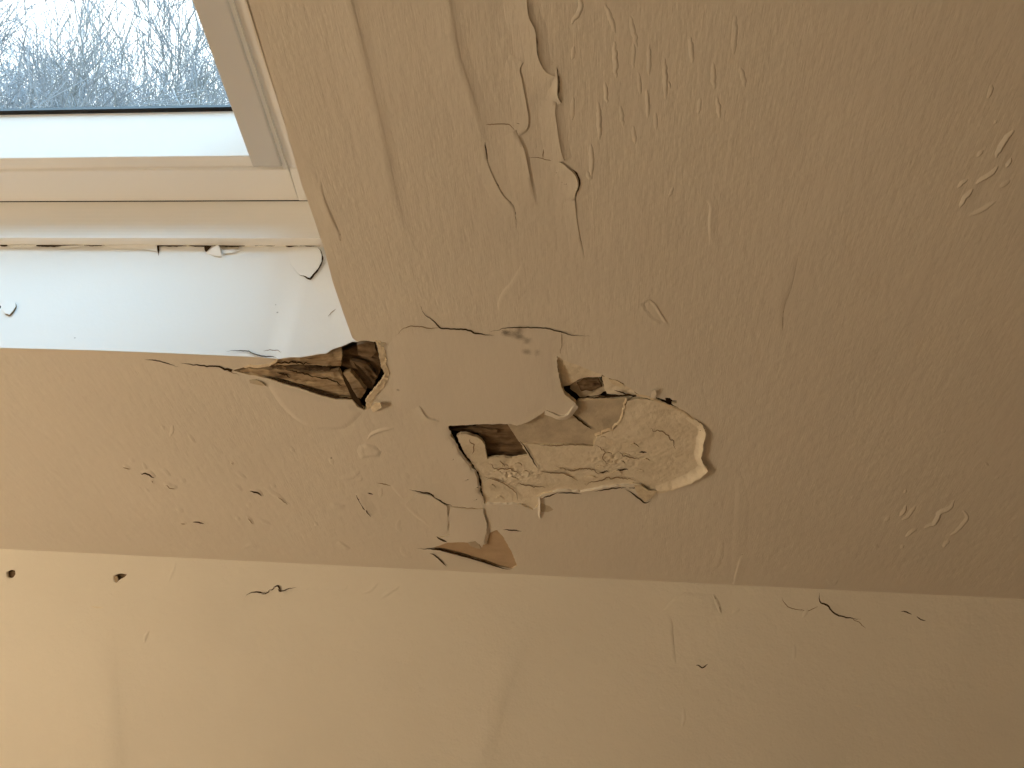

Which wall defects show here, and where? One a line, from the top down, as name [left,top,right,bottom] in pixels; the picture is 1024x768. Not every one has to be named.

peeling [486,0,585,260]
peeling [0,245,240,256]
peeling [286,246,323,280]
crack [403,307,579,350]
crack [149,349,280,378]
spalling [239,340,390,412]
spalling [379,357,708,574]
crack [242,585,298,606]
crack [782,591,864,627]